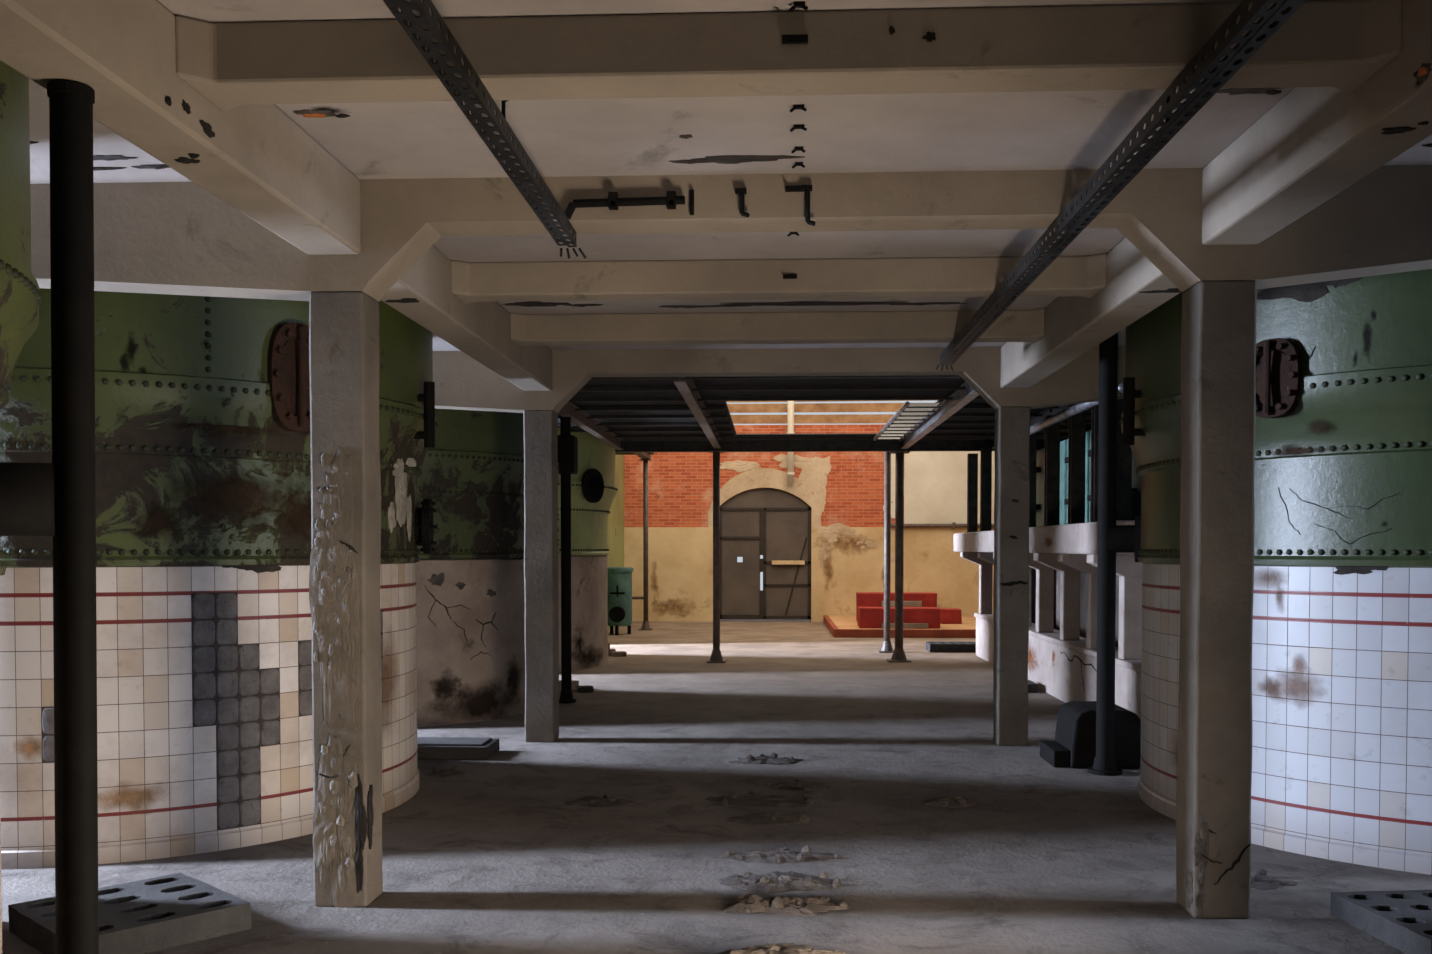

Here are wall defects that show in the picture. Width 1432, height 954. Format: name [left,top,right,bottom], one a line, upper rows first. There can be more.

flaking render [720,454,895,568]
crack [425,586,498,660]
water stain [435,664,519,720]
rust [1263,660,1308,697]
spalling [355,774,374,893]